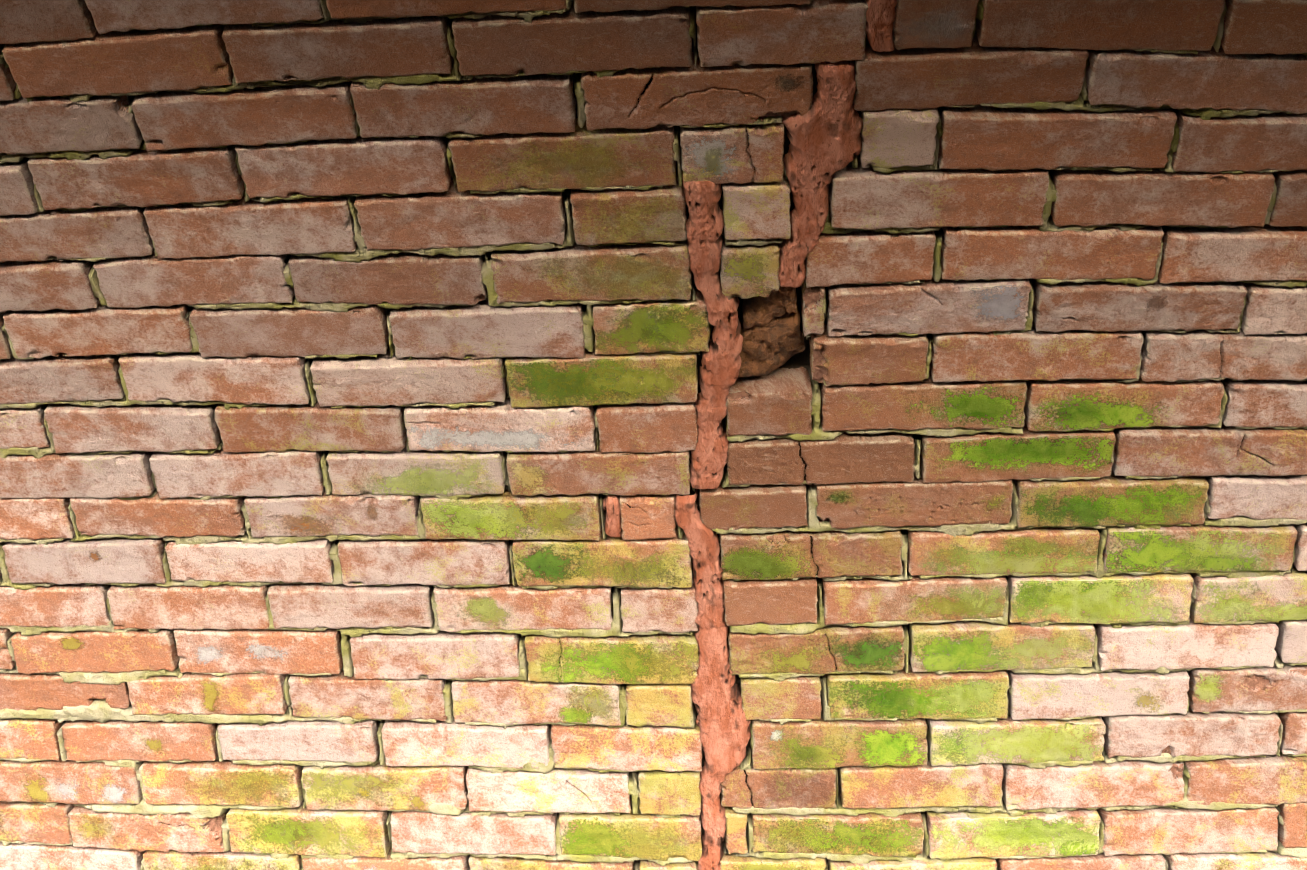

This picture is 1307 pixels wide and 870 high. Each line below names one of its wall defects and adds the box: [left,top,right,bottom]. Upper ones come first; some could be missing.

crack [746,0,897,288]
spalling [727,286,828,401]
damp [412,428,544,450]
crack [798,442,807,480]
crack [603,495,633,538]
crack [674,172,754,870]
crack [810,536,819,575]